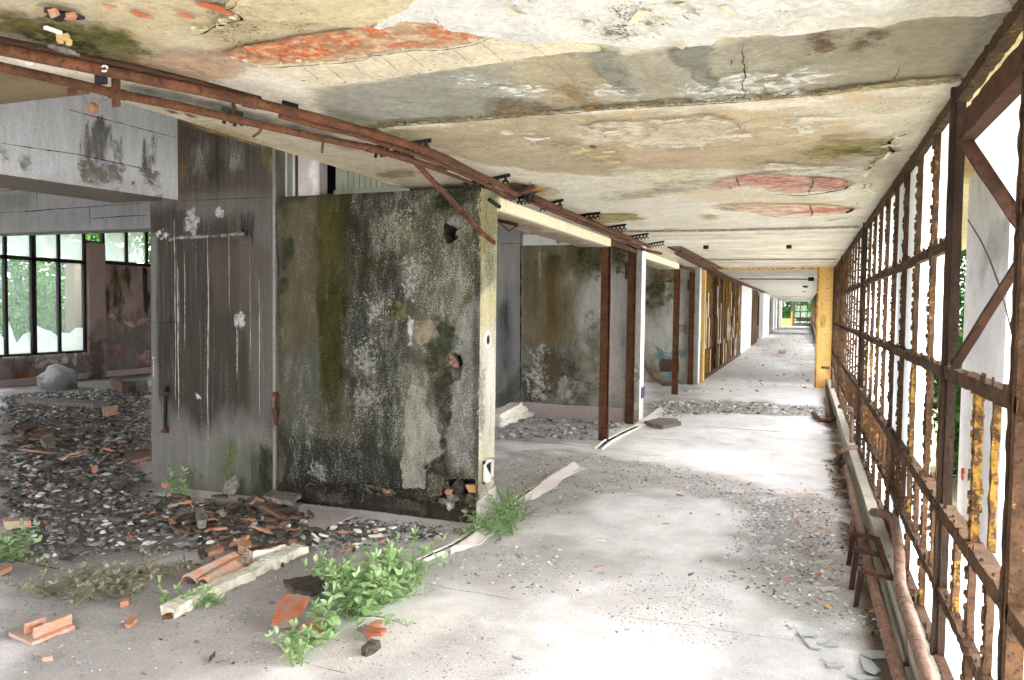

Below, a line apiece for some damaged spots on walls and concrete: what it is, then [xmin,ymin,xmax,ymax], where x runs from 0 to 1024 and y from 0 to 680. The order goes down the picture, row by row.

peeling [122,0,1013,86]
crack [728,48,748,96]
water stain [78,116,124,184]
water stain [139,138,159,187]
spalling [706,132,913,218]
spalling [442,214,462,247]
water stain [353,197,423,411]
water stain [423,316,479,479]
water stain [514,310,600,405]
peeling [274,384,480,524]